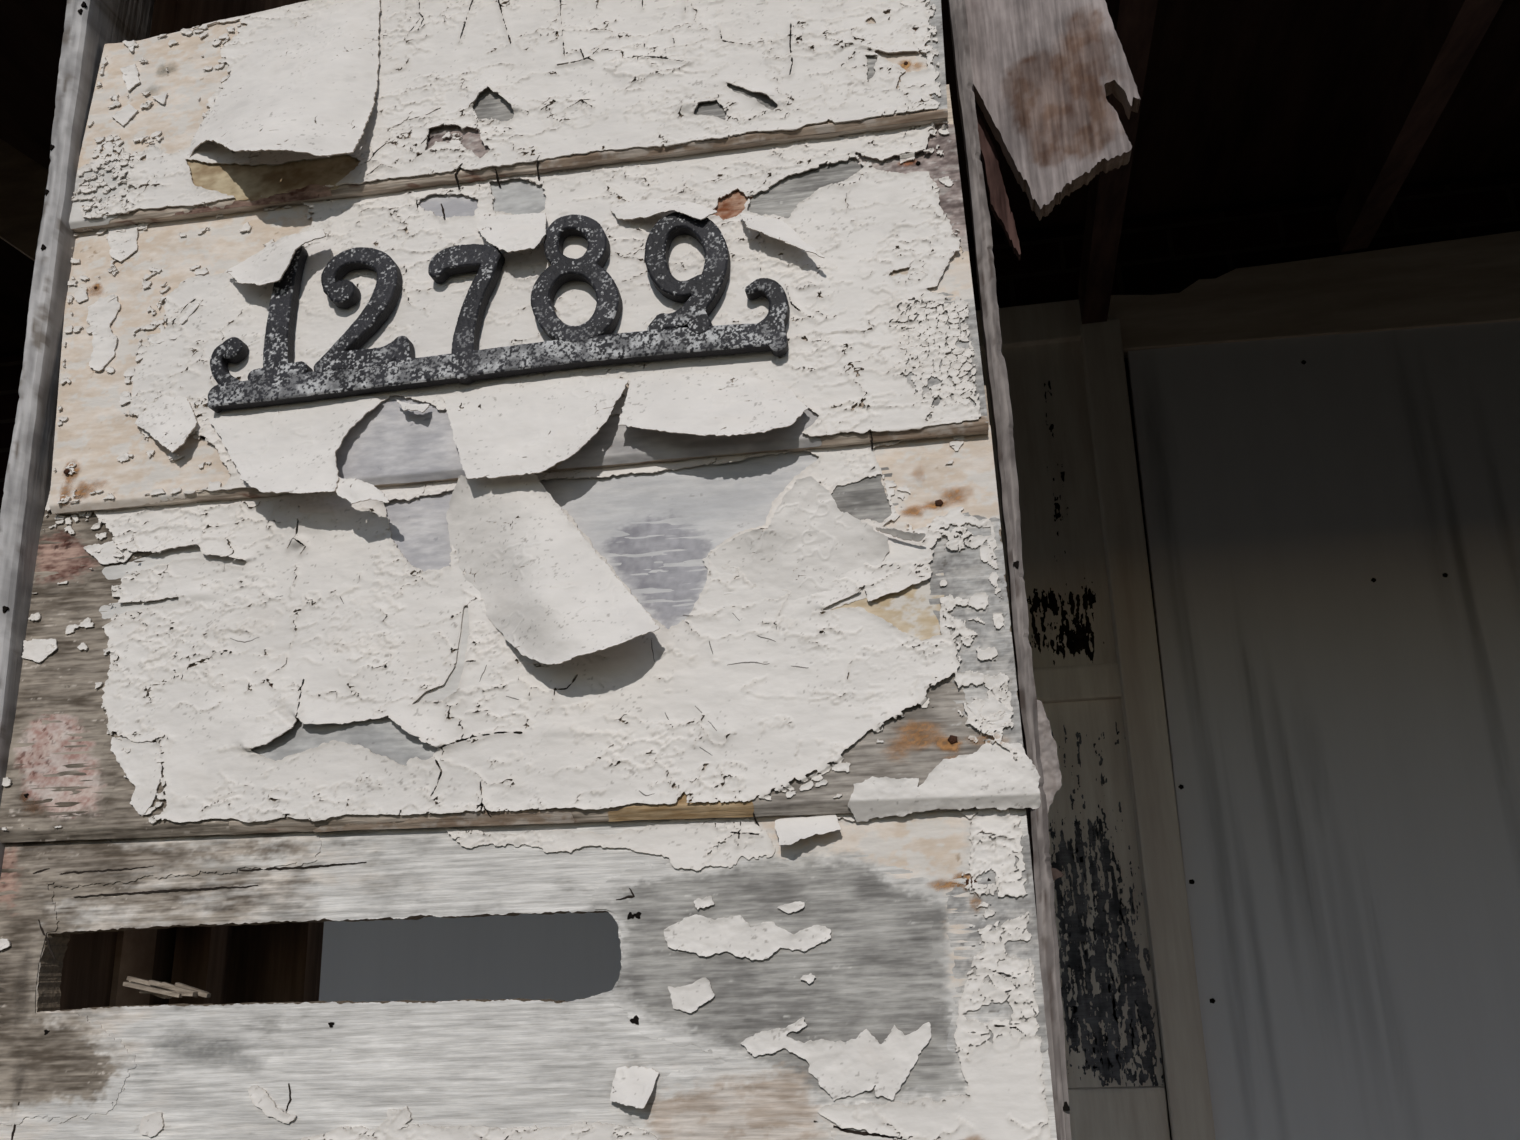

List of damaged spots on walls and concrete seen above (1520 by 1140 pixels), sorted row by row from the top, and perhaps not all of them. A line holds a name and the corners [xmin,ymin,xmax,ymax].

rust [905,490,962,515]
peeling [0,0,1164,1140]
rust [903,724,960,751]